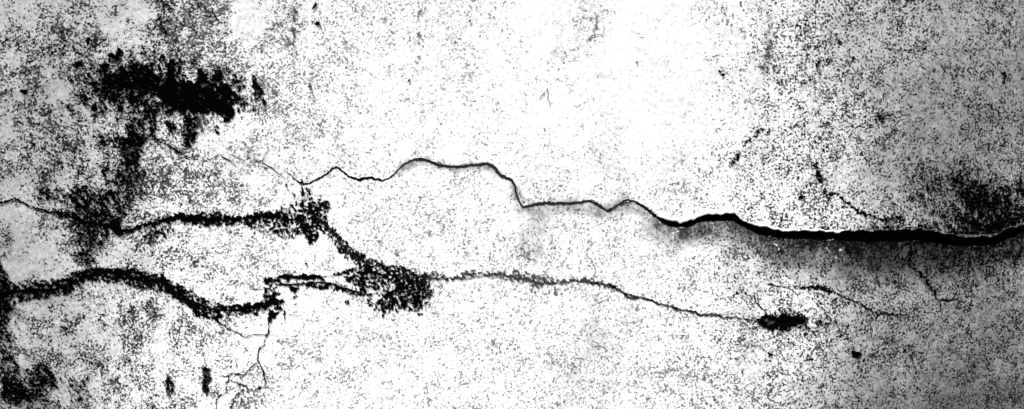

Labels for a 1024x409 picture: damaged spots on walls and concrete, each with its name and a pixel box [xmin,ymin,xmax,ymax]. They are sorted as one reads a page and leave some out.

crack [0,198,383,409]
crack [148,133,1024,309]
crack [420,269,908,322]
crack [729,120,809,167]